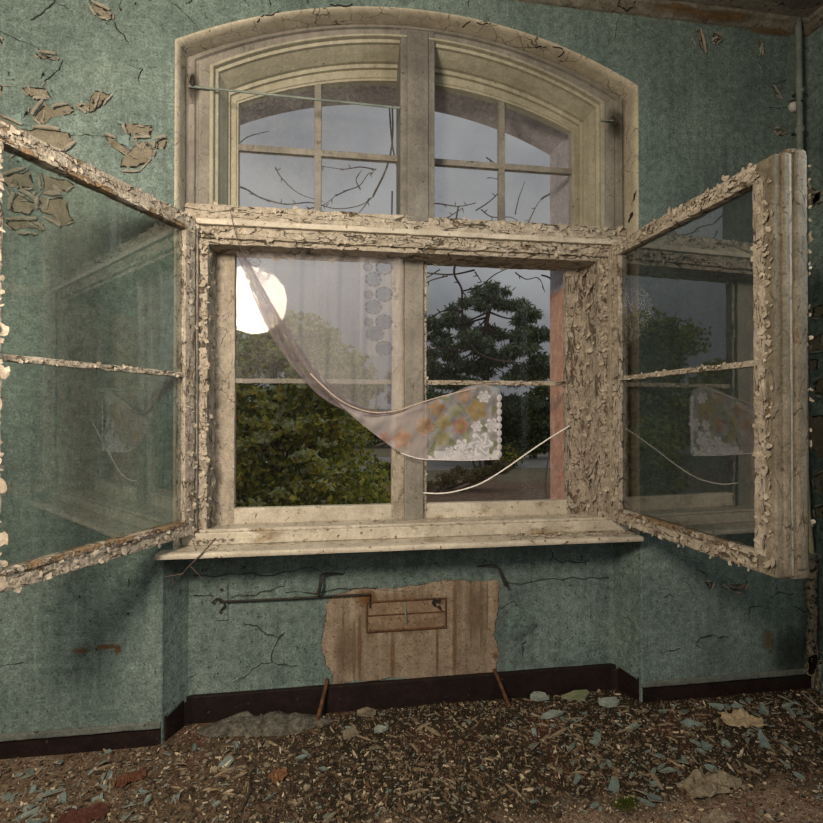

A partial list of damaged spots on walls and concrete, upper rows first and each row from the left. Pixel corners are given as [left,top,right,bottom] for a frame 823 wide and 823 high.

crack [31,0,92,20]
crack [244,0,279,23]
crack [0,31,63,84]
peeling [0,70,123,261]
peeling [105,115,168,172]
peeling [0,187,230,593]
peeling [551,163,775,594]
peeling [808,415,823,459]
crack [193,567,425,599]
crack [497,551,610,609]
crack [232,623,297,682]
flaking render [321,579,499,684]